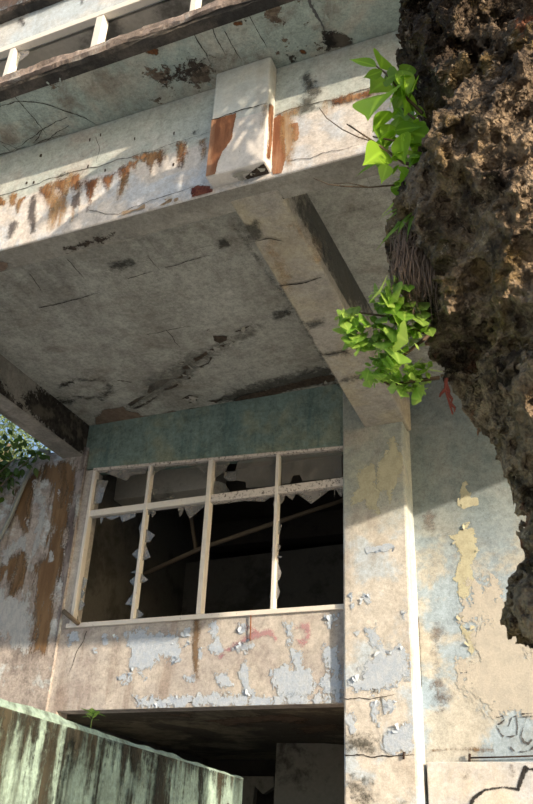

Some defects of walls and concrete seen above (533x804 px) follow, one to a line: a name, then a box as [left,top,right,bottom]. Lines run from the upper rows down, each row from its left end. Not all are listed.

damp [157,49,210,87]
corrosion [0,193,26,210]
corrosion [39,149,166,225]
crack [0,87,370,196]
corrosion [191,113,236,197]
corrosion [265,104,299,174]
damp [0,330,255,454]
peeling [350,436,403,515]
peeling [0,582,38,657]
peeling [93,621,415,756]
damp [0,706,241,804]
damp [346,734,374,754]